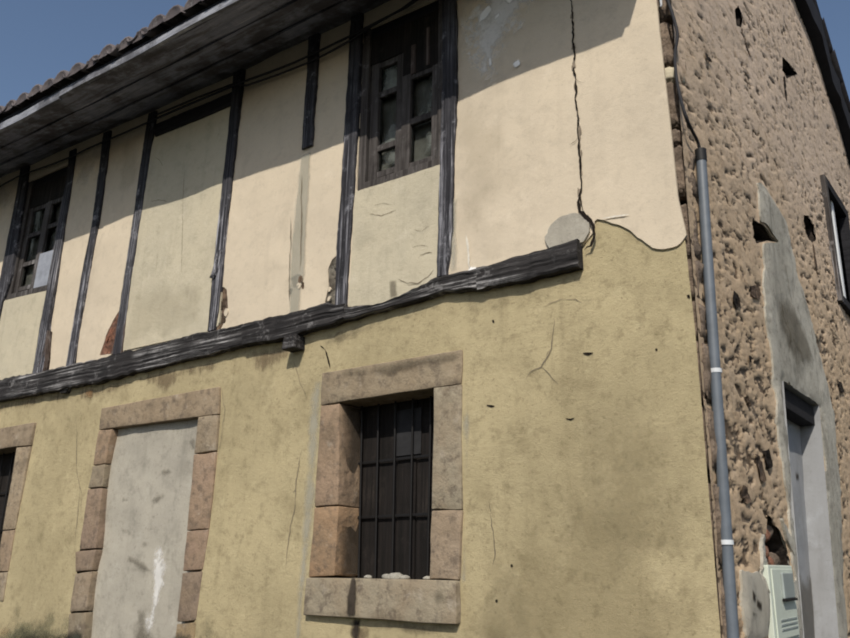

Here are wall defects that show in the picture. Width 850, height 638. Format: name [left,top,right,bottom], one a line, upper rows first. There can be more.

crack [570,0,596,250]
spalling [752,219,774,244]
flaking render [101,313,119,355]
flaking render [217,287,229,330]
crack [525,299,580,383]
spalling [758,514,796,593]